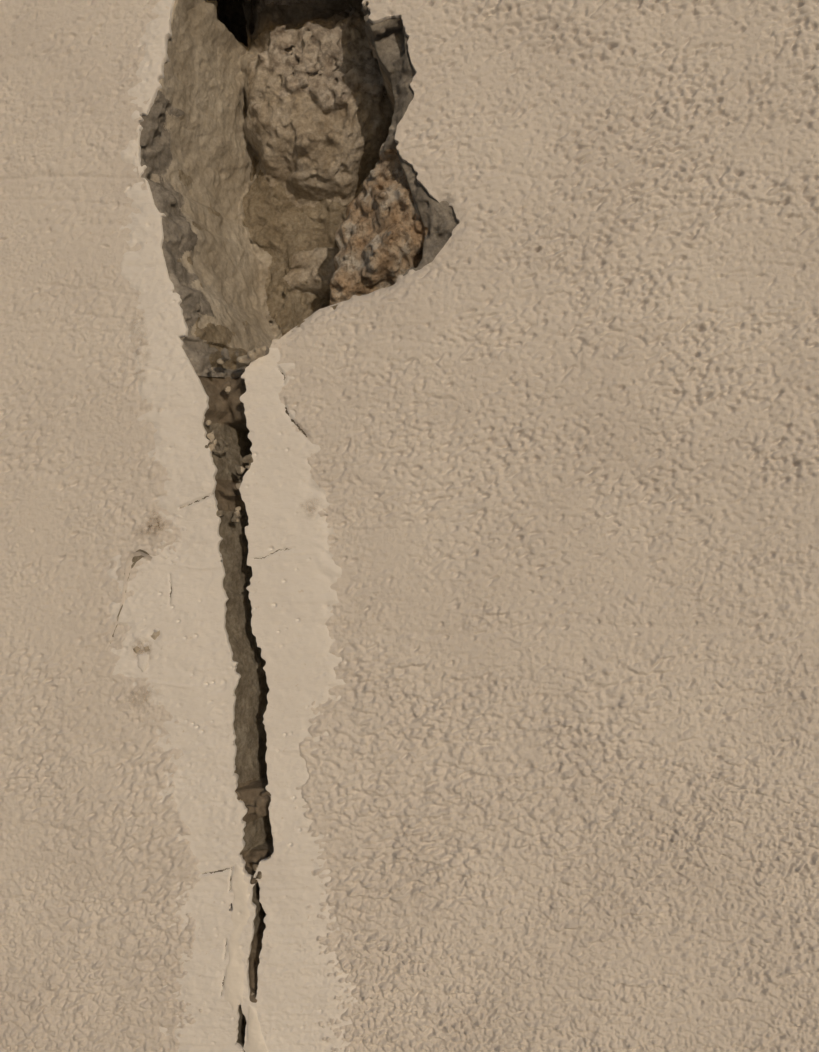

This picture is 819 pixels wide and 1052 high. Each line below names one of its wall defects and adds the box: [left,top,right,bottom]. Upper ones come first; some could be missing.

spalling [140,0,459,379]
crack [181,376,289,1052]